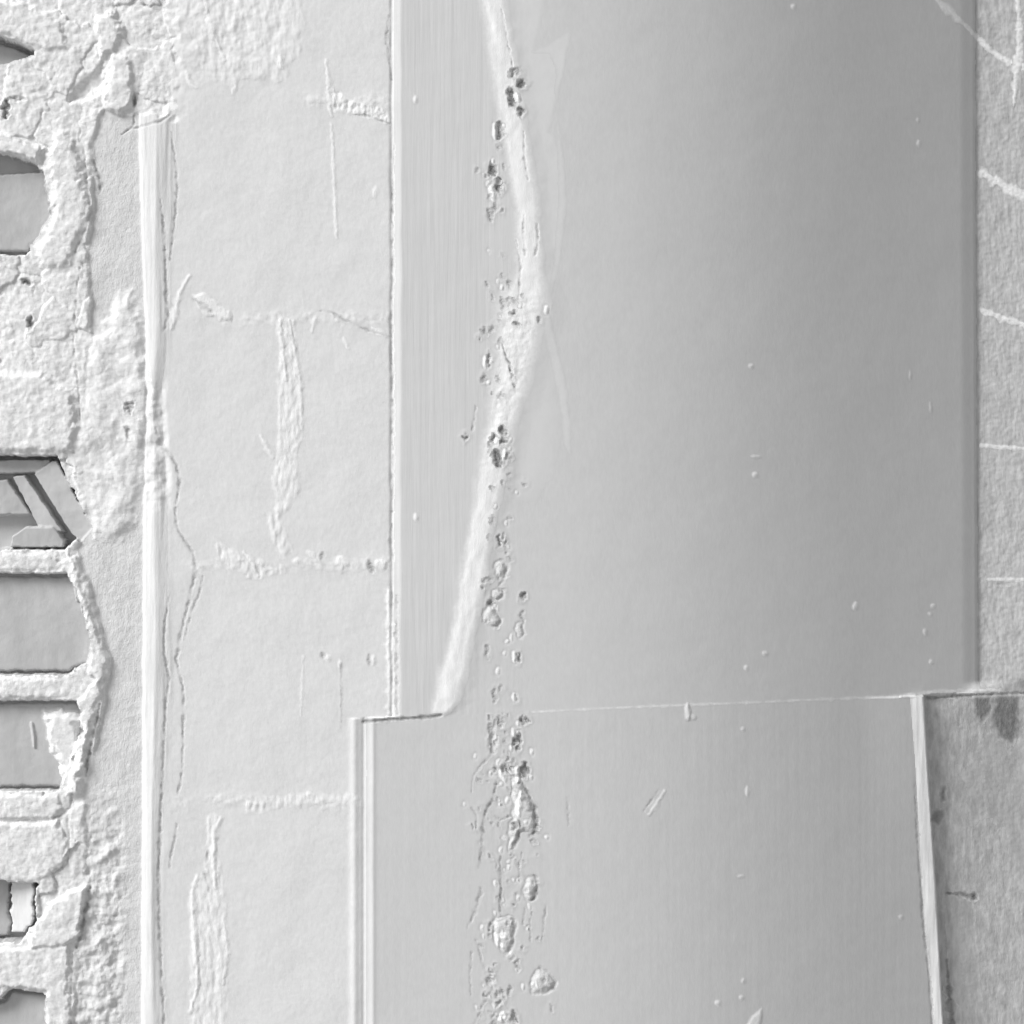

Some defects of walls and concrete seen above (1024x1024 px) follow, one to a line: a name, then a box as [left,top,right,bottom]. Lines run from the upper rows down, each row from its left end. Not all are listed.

spalling [0,95,28,122]
spalling [505,66,528,120]
spalling [474,120,507,224]
spalling [19,277,34,287]
spalling [25,314,36,332]
spalling [476,272,524,400]
spalling [123,400,135,441]
crack [154,426,205,1024]
spalling [462,424,559,1024]
water stain [962,691,1024,893]